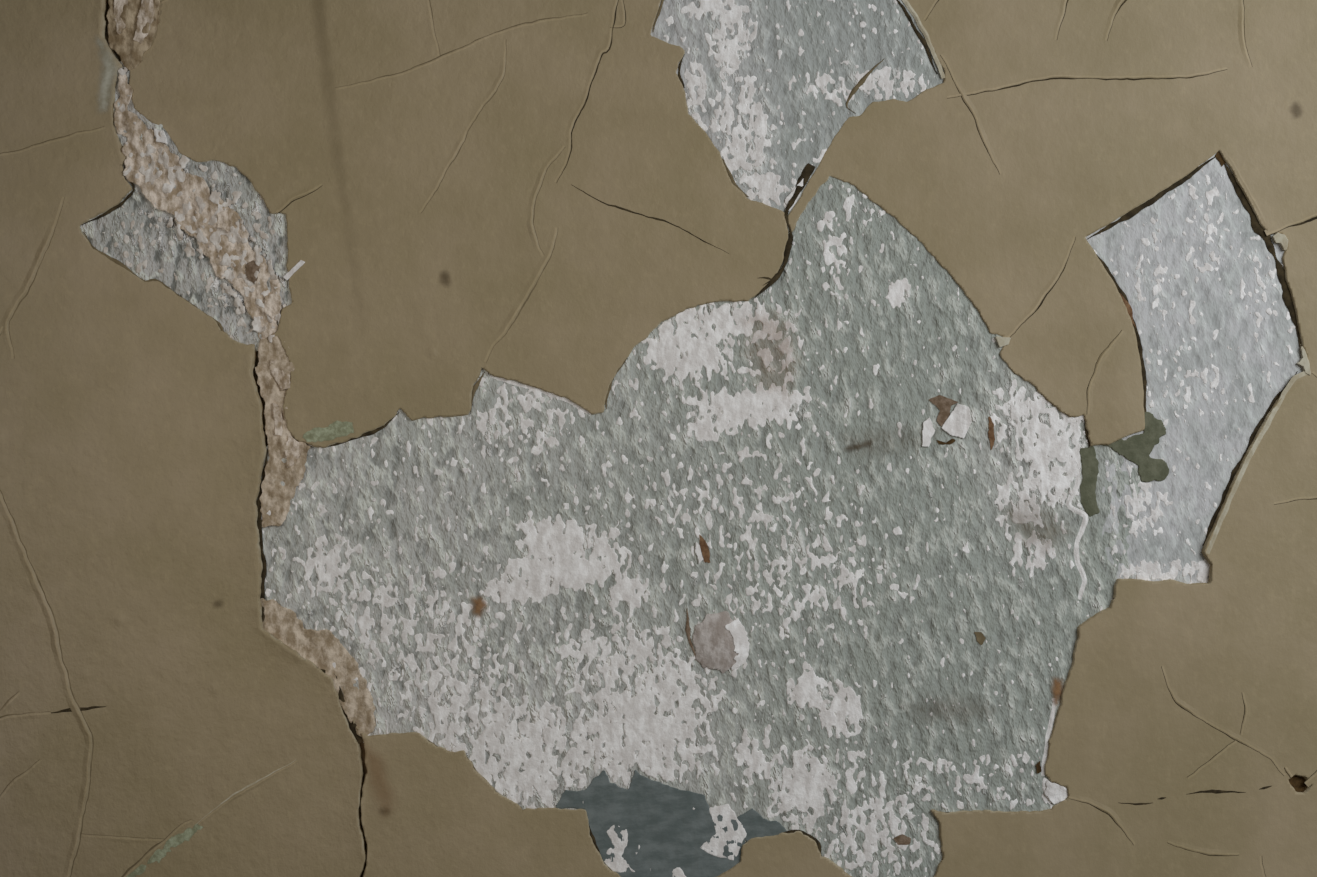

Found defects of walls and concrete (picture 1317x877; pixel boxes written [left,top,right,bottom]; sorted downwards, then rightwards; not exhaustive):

crack [98,0,160,109]
flaking render [80,61,305,351]
crack [335,0,729,363]
crack [755,163,815,298]
peeling [650,0,945,214]
crack [1003,236,1076,337]
crack [940,0,1252,175]
crack [1264,210,1317,236]
crack [253,333,311,527]
peeling [256,150,1311,877]
crack [0,490,106,877]
crack [359,742,367,877]